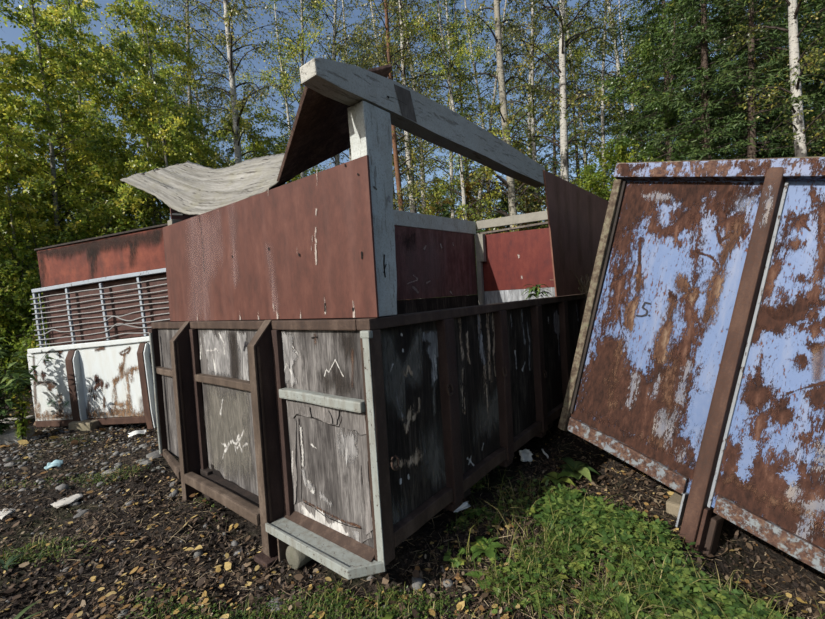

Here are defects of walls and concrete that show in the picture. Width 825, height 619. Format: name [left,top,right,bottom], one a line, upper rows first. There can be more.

rust [809,158,825,175]
water stain [39,229,162,286]
rust [571,160,771,486]
rust [33,351,73,420]
rust [87,346,145,418]
water stain [381,330,422,418]
peeling [625,371,661,411]
peeling [652,358,714,464]
rust [713,184,825,549]
peeling [734,435,759,483]
peeling [810,434,825,486]
peeling [776,462,825,541]